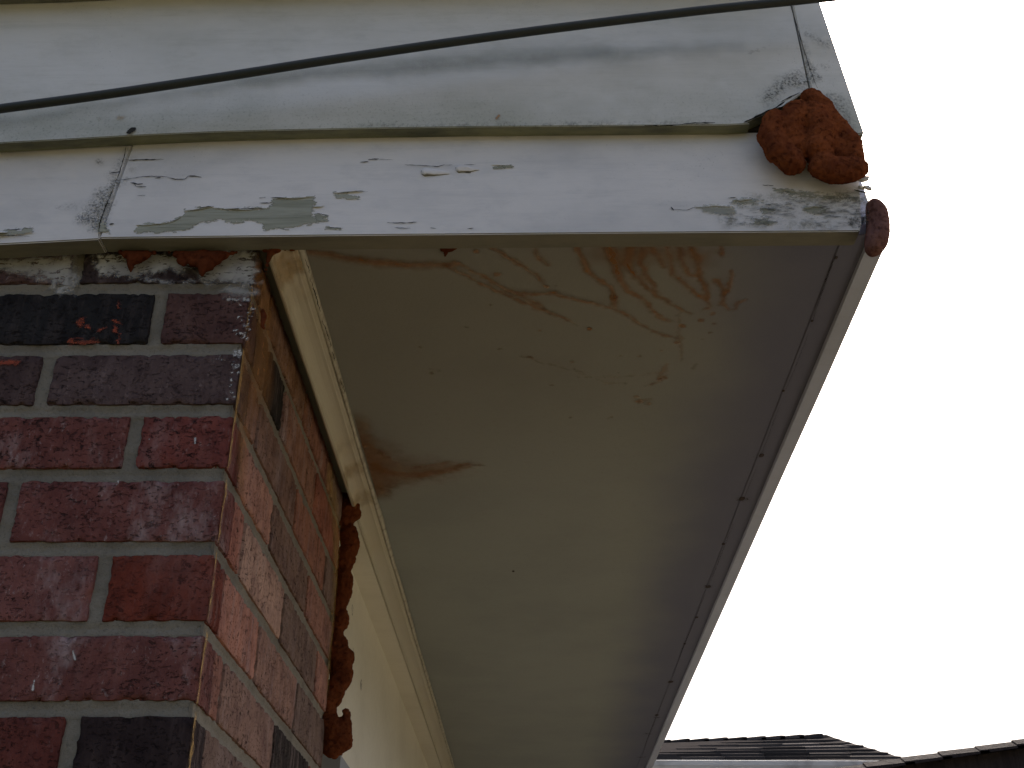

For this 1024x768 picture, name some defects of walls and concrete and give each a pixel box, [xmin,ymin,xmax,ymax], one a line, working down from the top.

peeling [134,196,341,233]
peeling [333,191,368,200]
peeling [671,185,834,225]